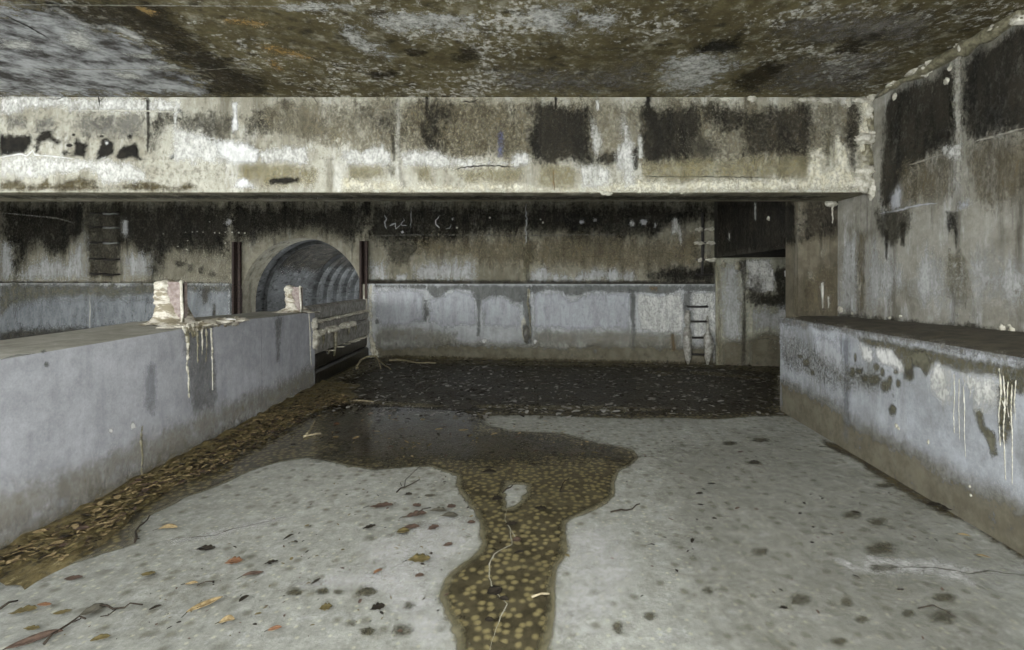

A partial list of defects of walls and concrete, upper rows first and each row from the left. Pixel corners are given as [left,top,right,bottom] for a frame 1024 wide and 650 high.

water stain [0,0,1024,331]
water stain [70,456,488,650]
water stain [0,201,921,550]
water stain [481,380,1024,650]
efflorescence [930,364,998,412]